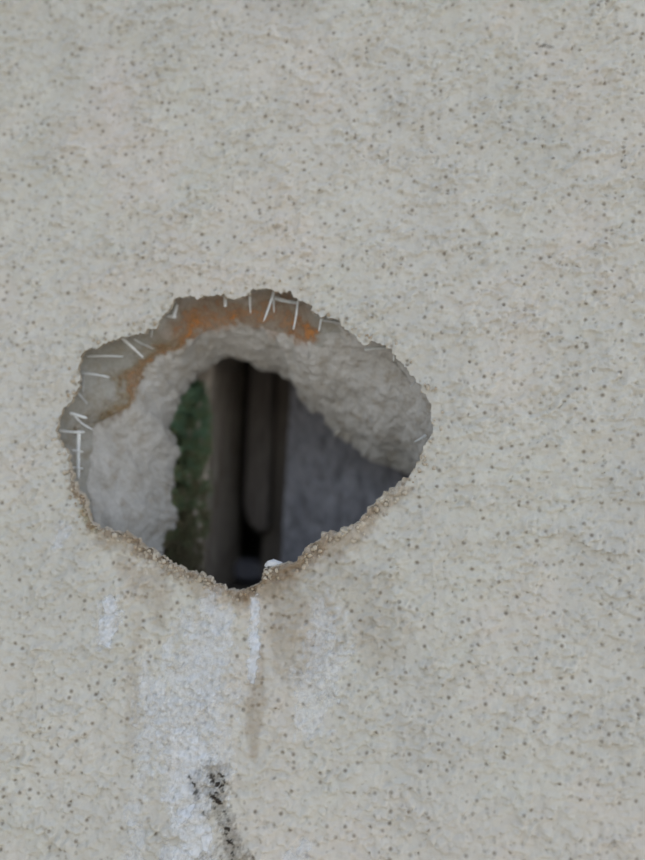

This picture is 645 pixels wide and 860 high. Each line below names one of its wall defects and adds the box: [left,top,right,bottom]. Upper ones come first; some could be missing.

rust [101,296,318,416]
spalling [51,275,444,601]
damp [99,595,121,648]
damp [247,598,260,684]
damp [152,595,232,860]